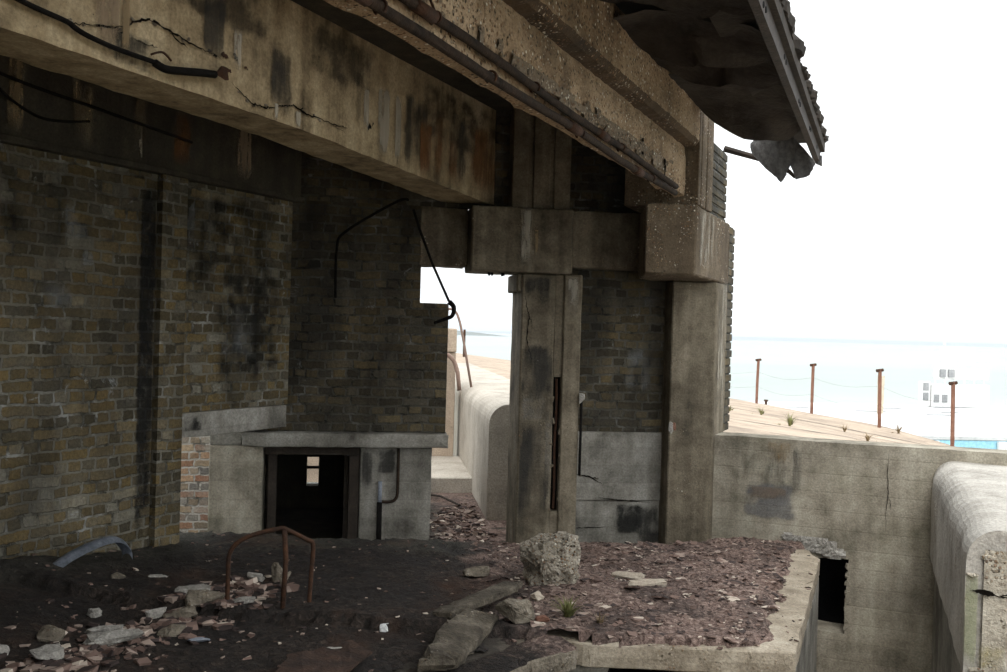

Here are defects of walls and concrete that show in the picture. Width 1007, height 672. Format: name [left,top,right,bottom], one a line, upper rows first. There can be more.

damp [97,0,147,63]
crack [69,17,219,57]
damp [191,0,266,64]
damp [272,50,301,126]
crack [233,84,346,134]
damp [316,27,495,176]
damp [135,191,156,520]
crack [970,589,1007,599]